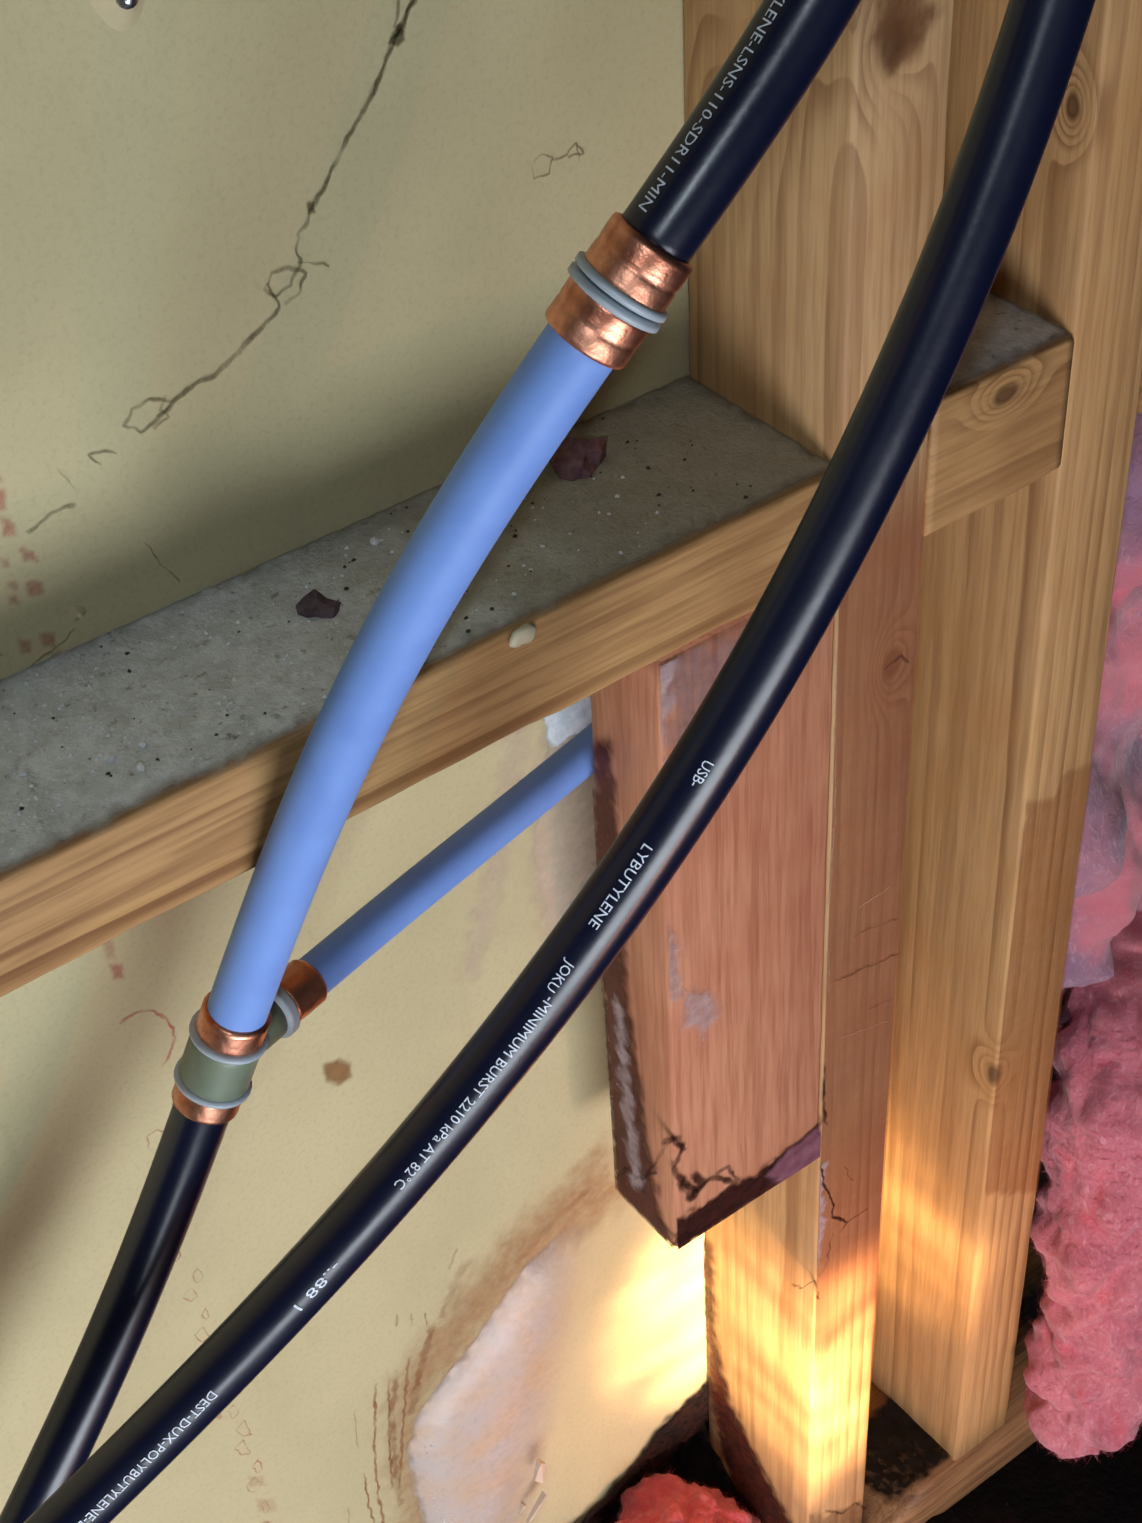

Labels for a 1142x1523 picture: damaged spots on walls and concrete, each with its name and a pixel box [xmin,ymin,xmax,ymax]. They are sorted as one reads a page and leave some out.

water stain [877,0,933,66]
crack [308,0,417,214]
crack [246,253,327,344]
crack [141,374,215,433]